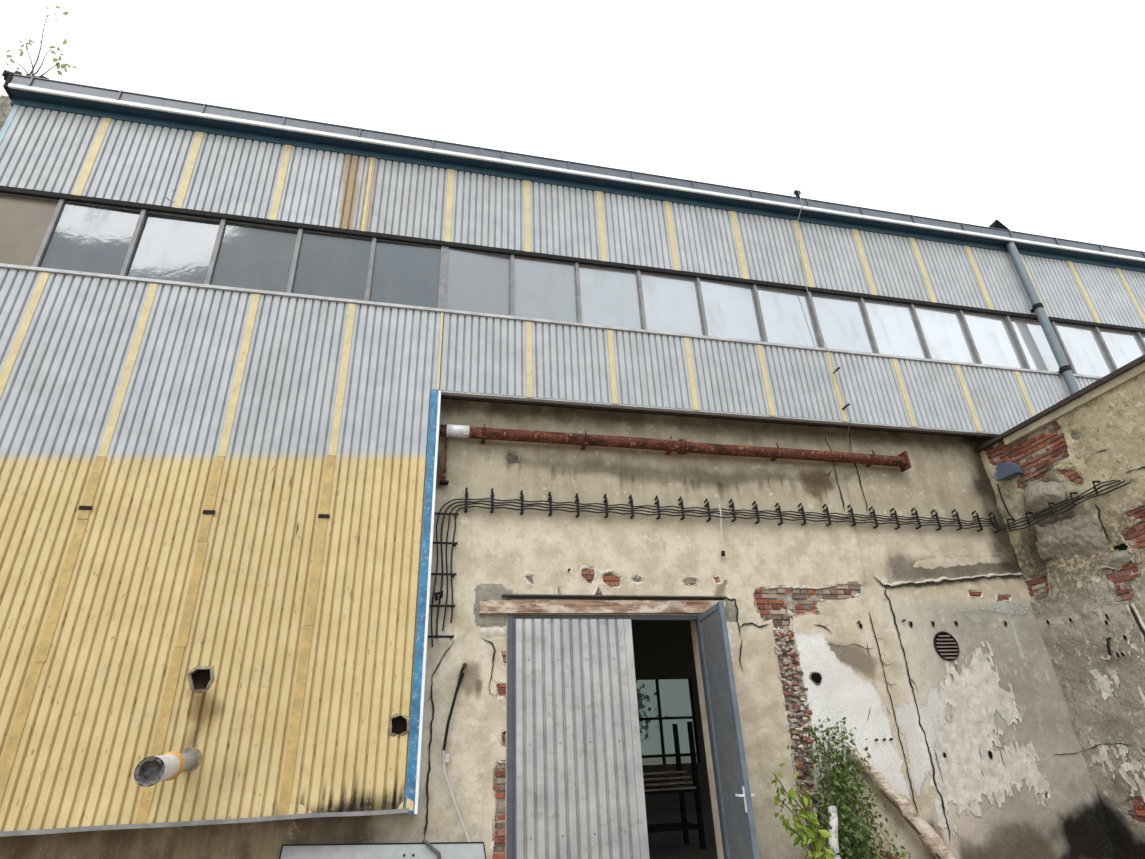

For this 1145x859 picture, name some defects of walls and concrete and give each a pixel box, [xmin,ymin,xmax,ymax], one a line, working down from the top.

spalling [984,421,1084,490]
spalling [580,565,643,595]
spalling [751,583,864,634]
spalling [1099,502,1145,626]
crack [1125,603,1145,646]
peeling [1090,639,1144,700]
crack [817,572,1023,837]
peeling [919,641,1051,835]
spalling [489,728,506,859]
leakage [961,797,1145,859]
peeling [1084,742,1145,822]